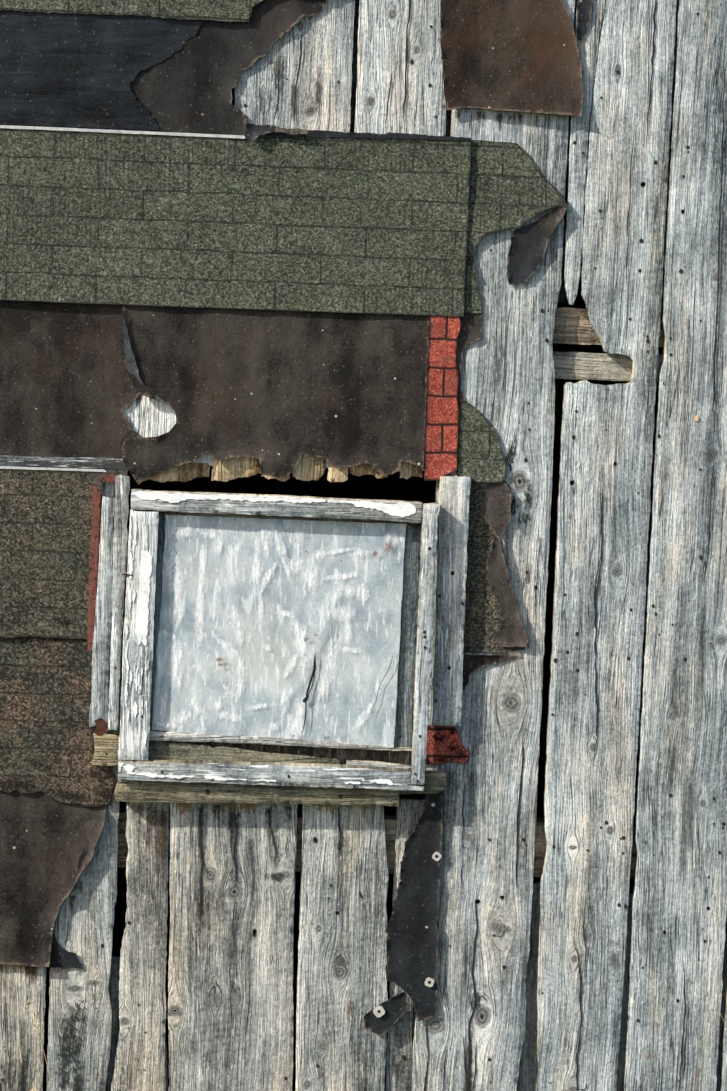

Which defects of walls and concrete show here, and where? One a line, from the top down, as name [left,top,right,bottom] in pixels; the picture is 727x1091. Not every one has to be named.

crack [302,618,334,732]
crack [594,465,603,760]